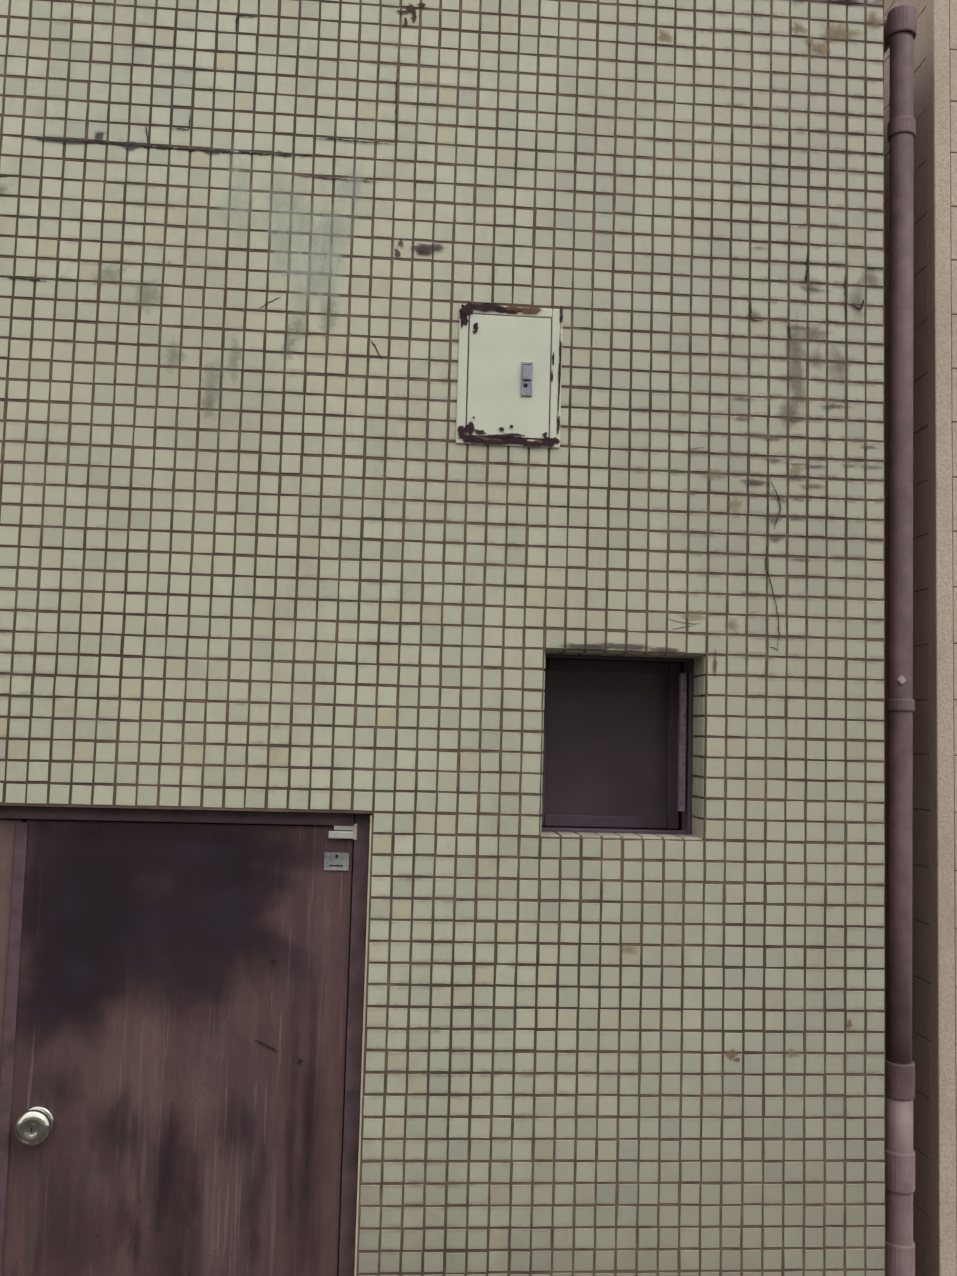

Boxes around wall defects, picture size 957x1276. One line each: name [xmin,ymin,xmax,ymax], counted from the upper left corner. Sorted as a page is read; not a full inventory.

rust [397,3,426,26]
rust [505,306,541,314]
rust [551,306,563,434]